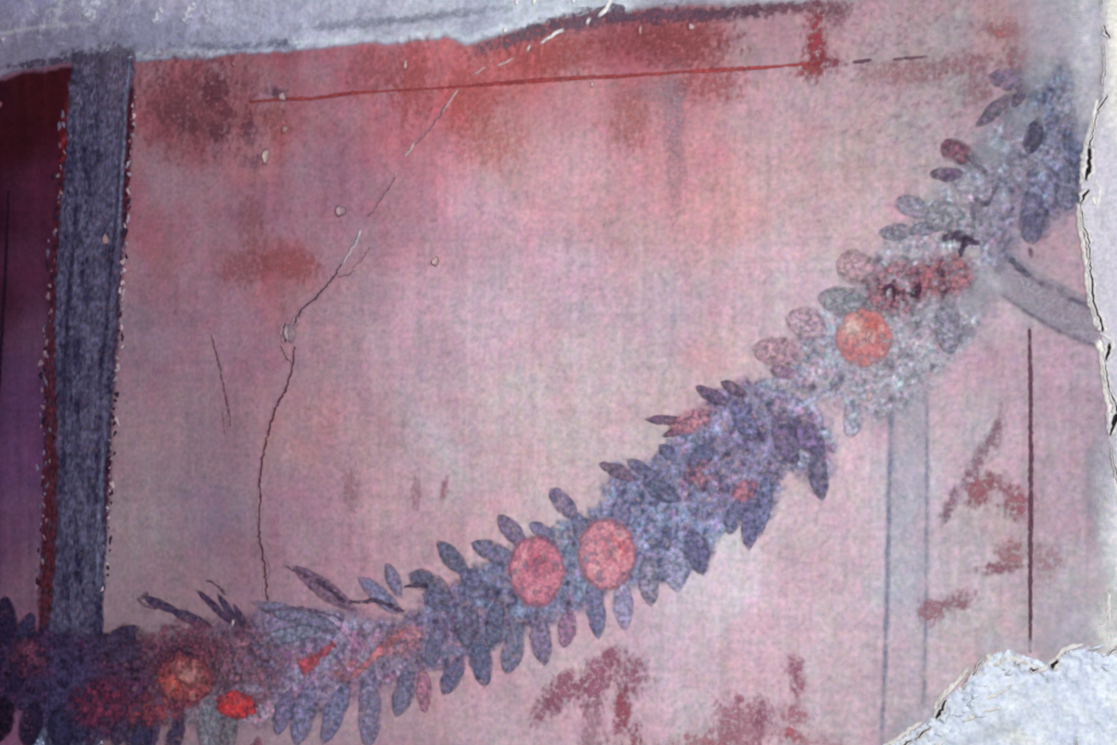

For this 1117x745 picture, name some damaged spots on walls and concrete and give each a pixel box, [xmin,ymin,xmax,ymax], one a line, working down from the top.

crack [256,0,613,621]
flaking render [1081,0,1117,407]
flaking render [1108,429,1117,466]
spalling [883,644,1117,745]